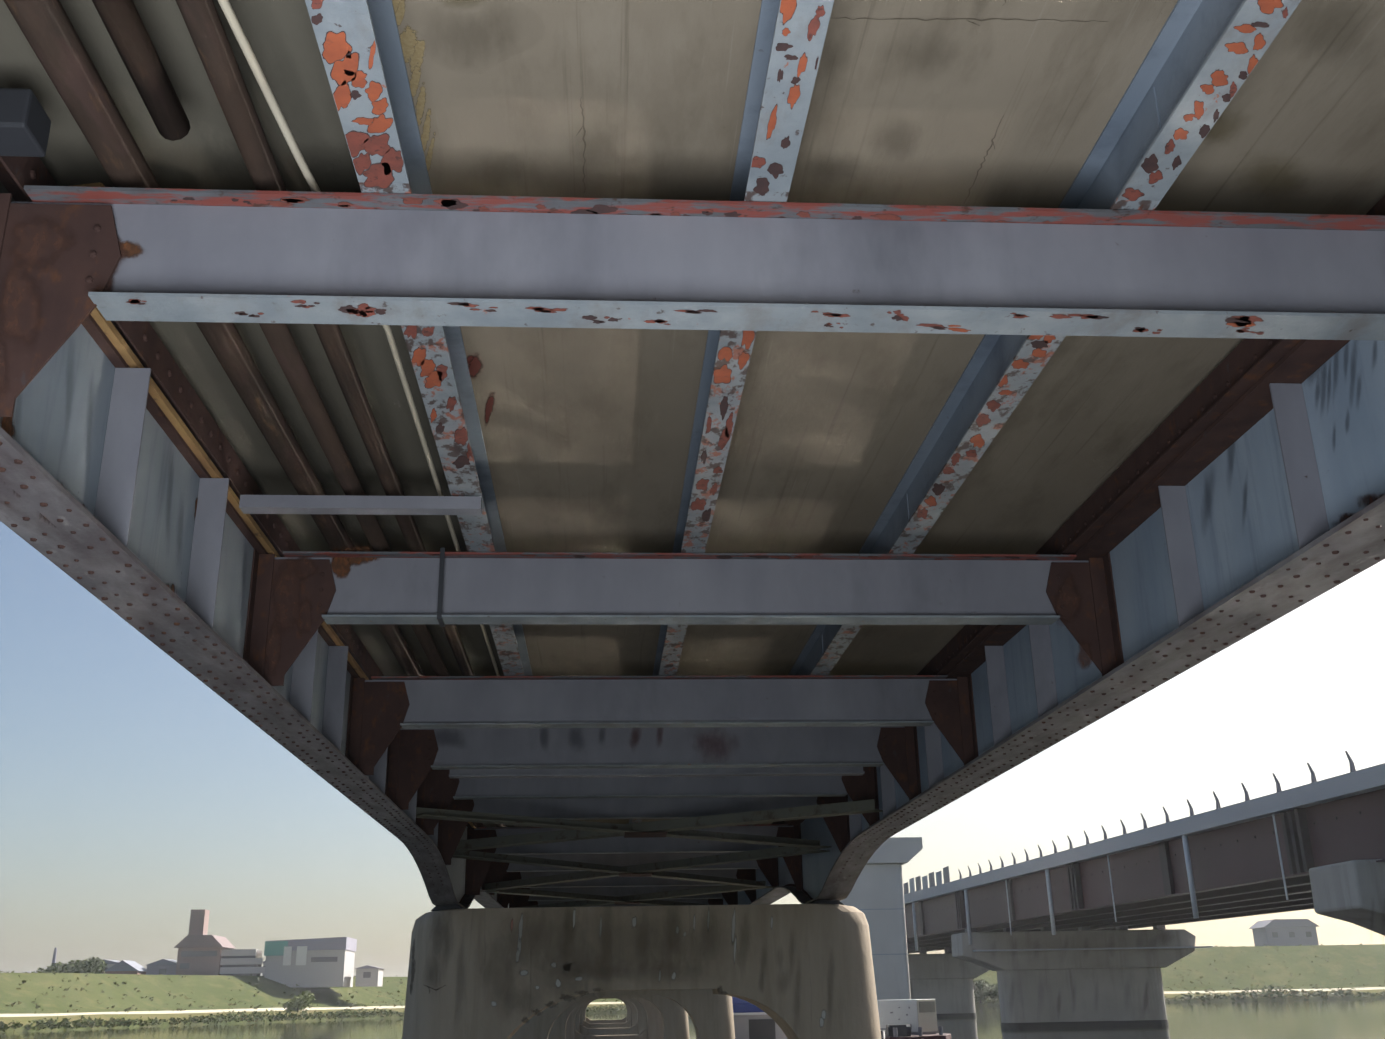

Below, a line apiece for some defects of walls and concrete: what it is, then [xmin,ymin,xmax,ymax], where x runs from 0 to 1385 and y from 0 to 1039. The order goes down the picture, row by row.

peeling [311,0,404,189]
peeling [392,0,435,171]
peeling [751,0,826,196]
peeling [1122,0,1288,201]
peeling [404,325,472,469]
peeling [691,331,755,522]
peeling [917,335,1056,519]